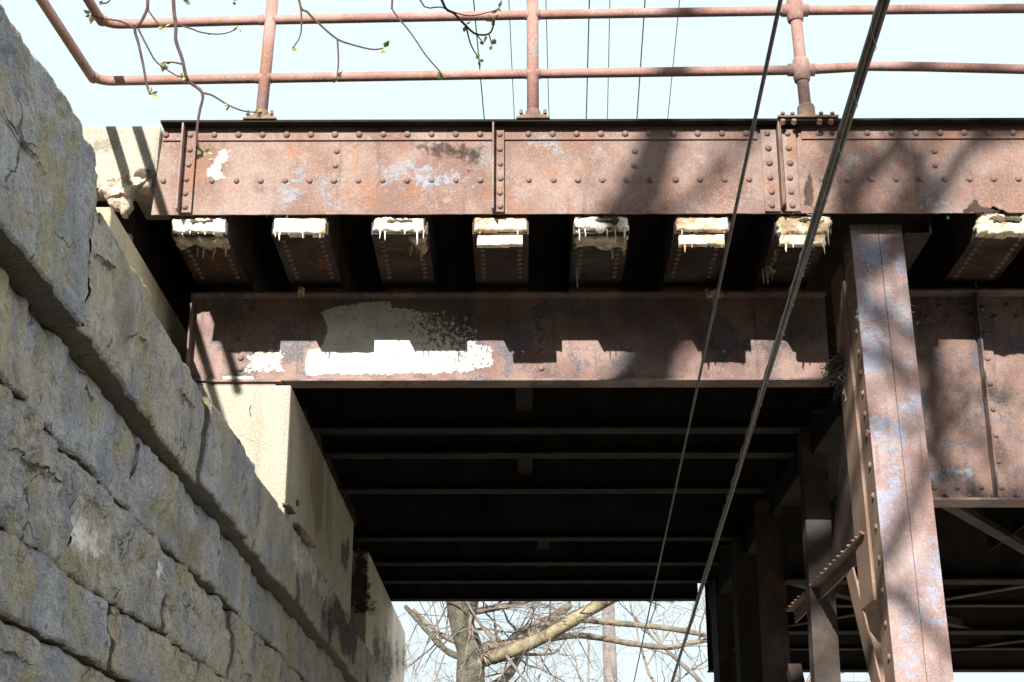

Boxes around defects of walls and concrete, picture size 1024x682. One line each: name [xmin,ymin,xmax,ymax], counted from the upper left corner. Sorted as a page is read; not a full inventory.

crack [3,110,46,175]
corrosion [417,140,480,171]
spalling [98,167,154,219]
leakage [373,216,428,259]
leakage [473,217,527,248]
leakage [574,215,629,259]
corrosion [804,174,813,205]
corrosion [963,199,999,213]
leakage [973,212,1024,240]
peeling [304,301,494,376]
peeling [222,349,284,379]
leakage [291,541,379,665]